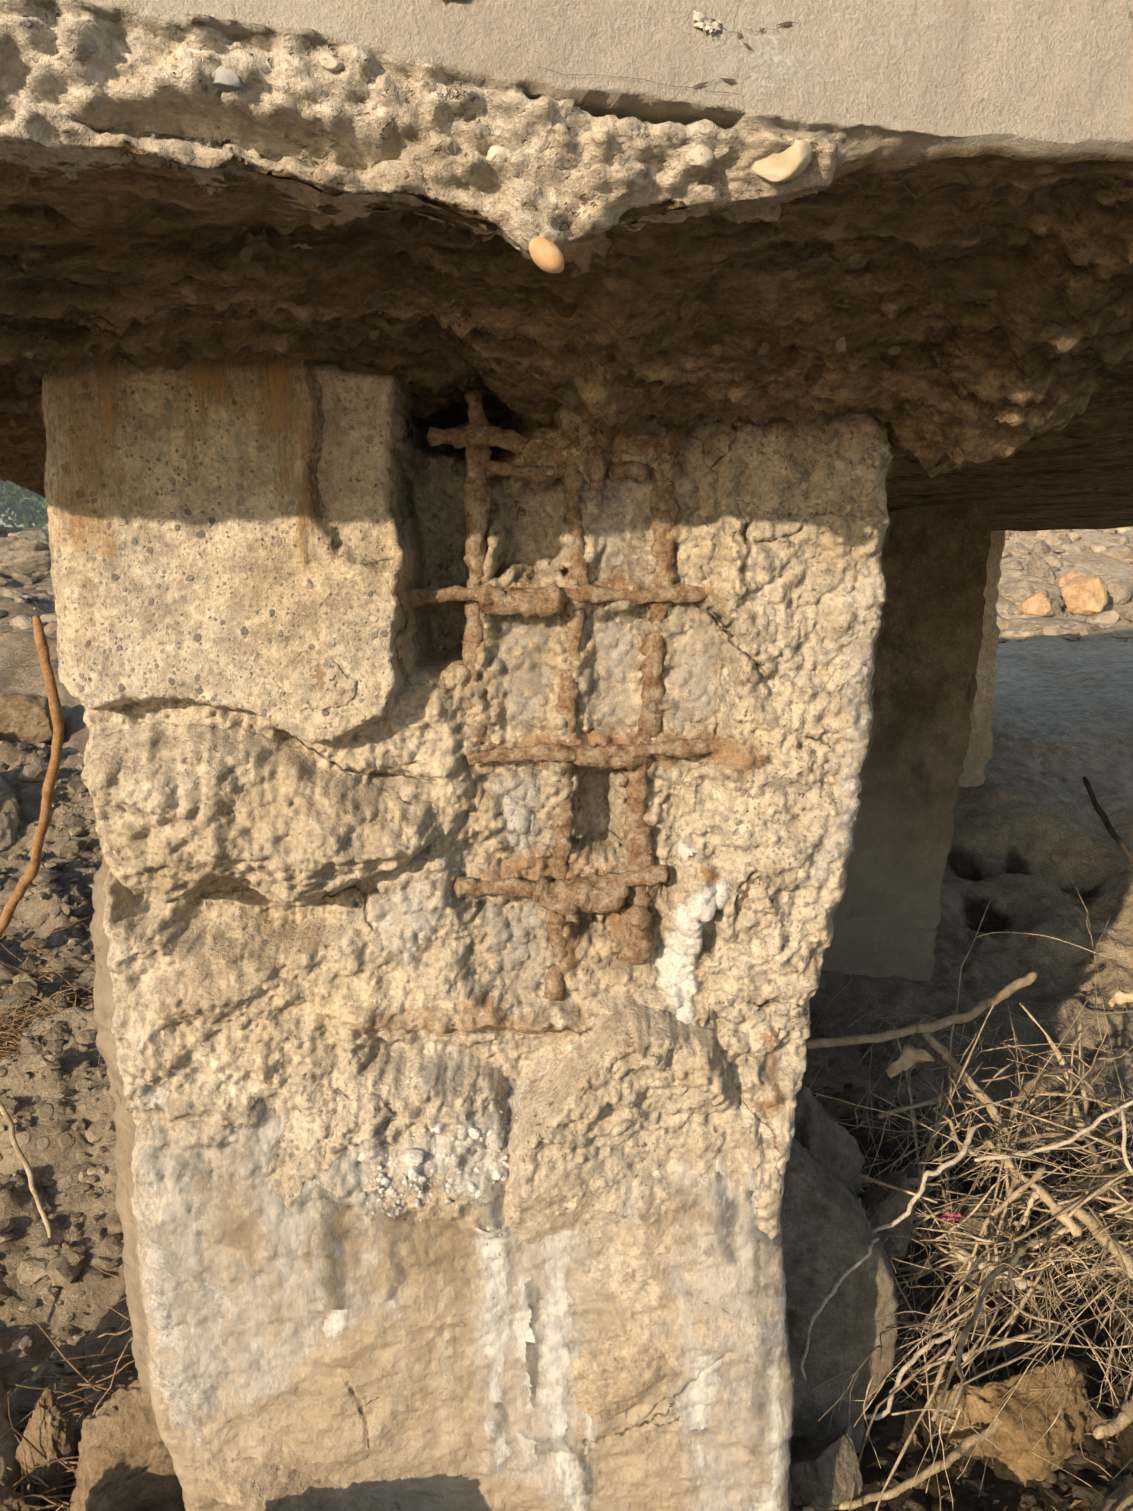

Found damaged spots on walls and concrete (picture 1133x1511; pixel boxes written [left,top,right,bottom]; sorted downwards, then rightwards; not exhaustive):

spalling [0,0,838,274]
corrosion [490,424,684,486]
spalling [304,359,875,1019]
crack [271,728,436,781]
corrosion [478,728,632,771]
corrosion [647,731,769,776]
corrosion [480,837,627,881]
corrosion [700,867,717,885]
corrosion [559,922,580,975]
damp [655,878,734,1025]
damp [132,1081,594,1511]
crack [584,1393,681,1447]